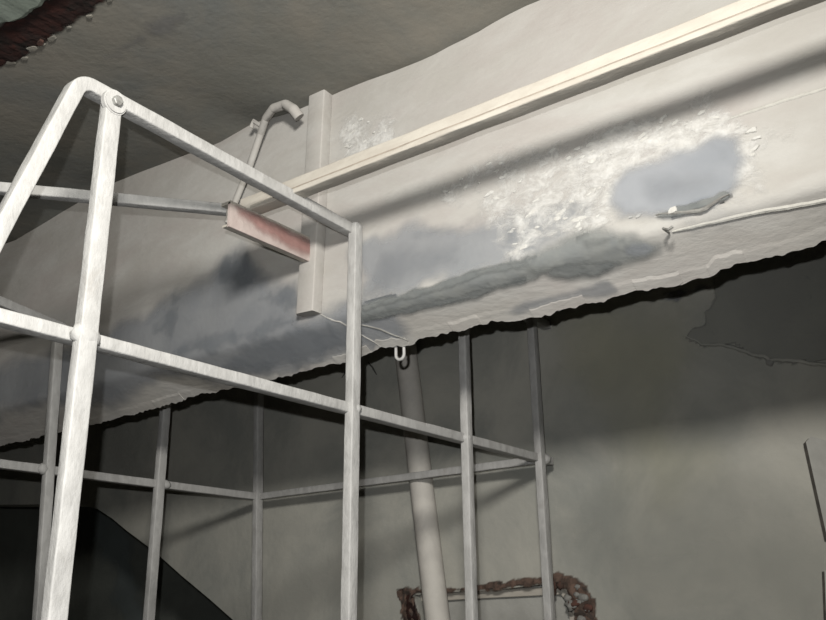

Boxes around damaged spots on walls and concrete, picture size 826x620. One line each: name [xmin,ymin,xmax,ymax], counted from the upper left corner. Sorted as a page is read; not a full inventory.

water stain [362,97,762,293]
spalling [655,191,730,217]
water stain [110,257,347,371]
water stain [361,316,402,345]
peeling [361,227,826,367]
water stain [0,356,50,405]
water stain [60,351,72,403]
water stain [91,352,176,402]
spalling [89,382,236,425]
spalling [252,352,346,380]
spalling [0,428,45,446]